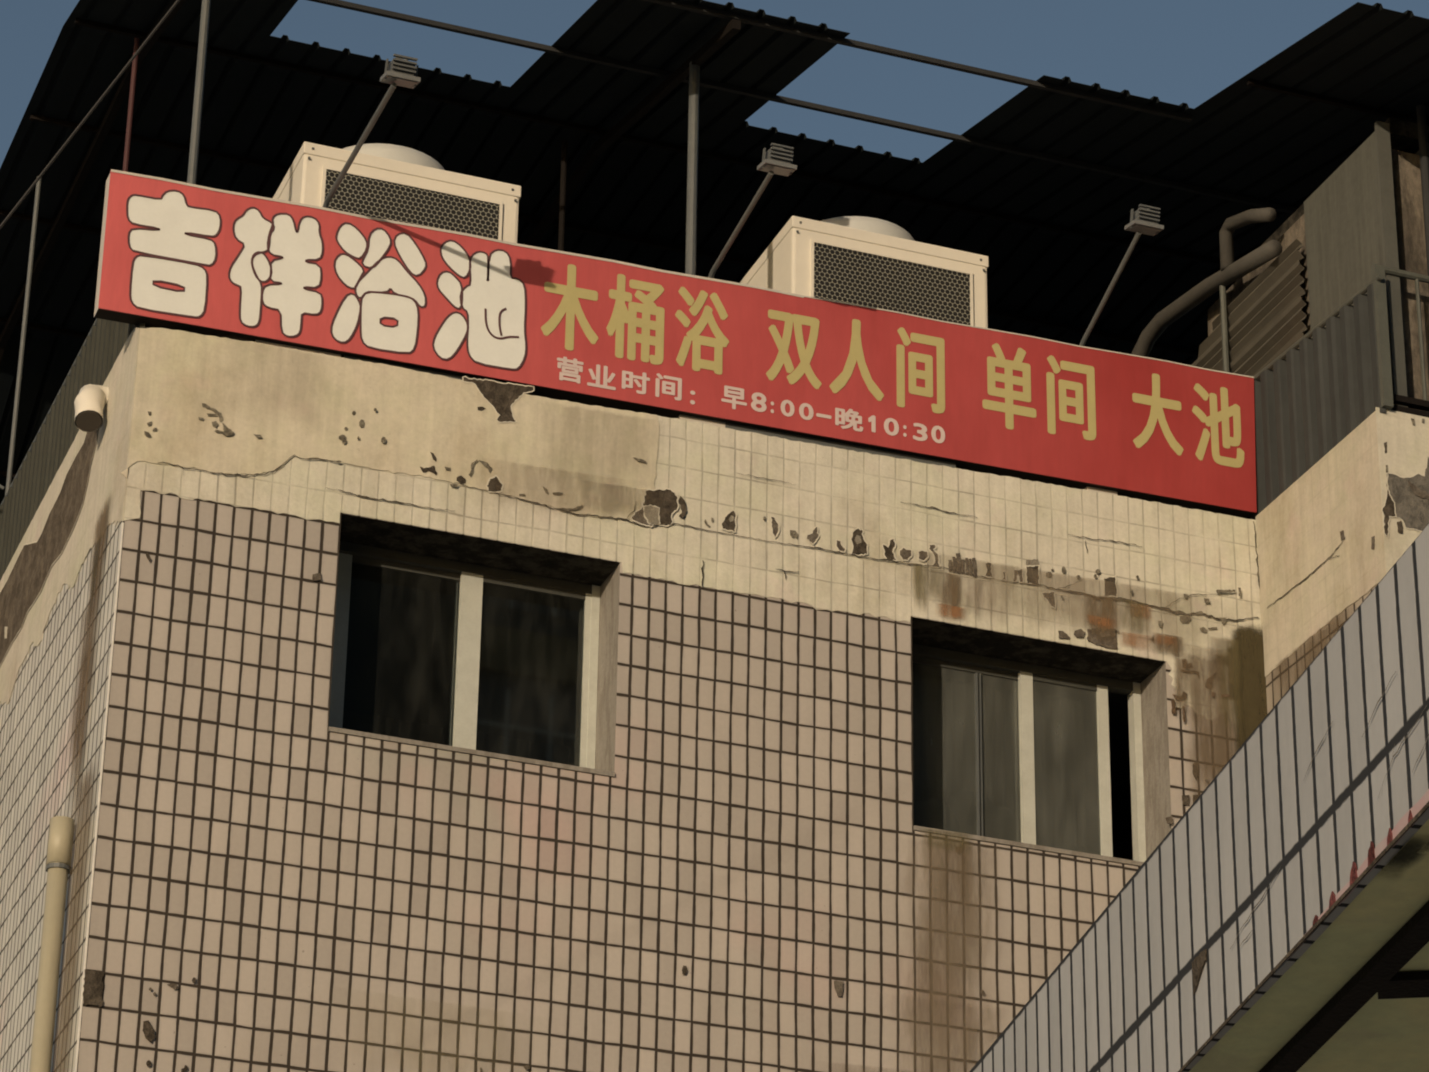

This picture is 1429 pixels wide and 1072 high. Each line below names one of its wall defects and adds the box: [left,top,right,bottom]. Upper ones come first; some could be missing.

peeling [198,403,234,436]
spalling [0,429,99,666]
spalling [420,452,526,497]
peeling [543,487,583,511]
spalling [630,488,687,527]
spalling [704,509,737,533]
crack [158,455,1344,621]
spalling [763,515,1139,610]
spalling [1371,442,1429,549]